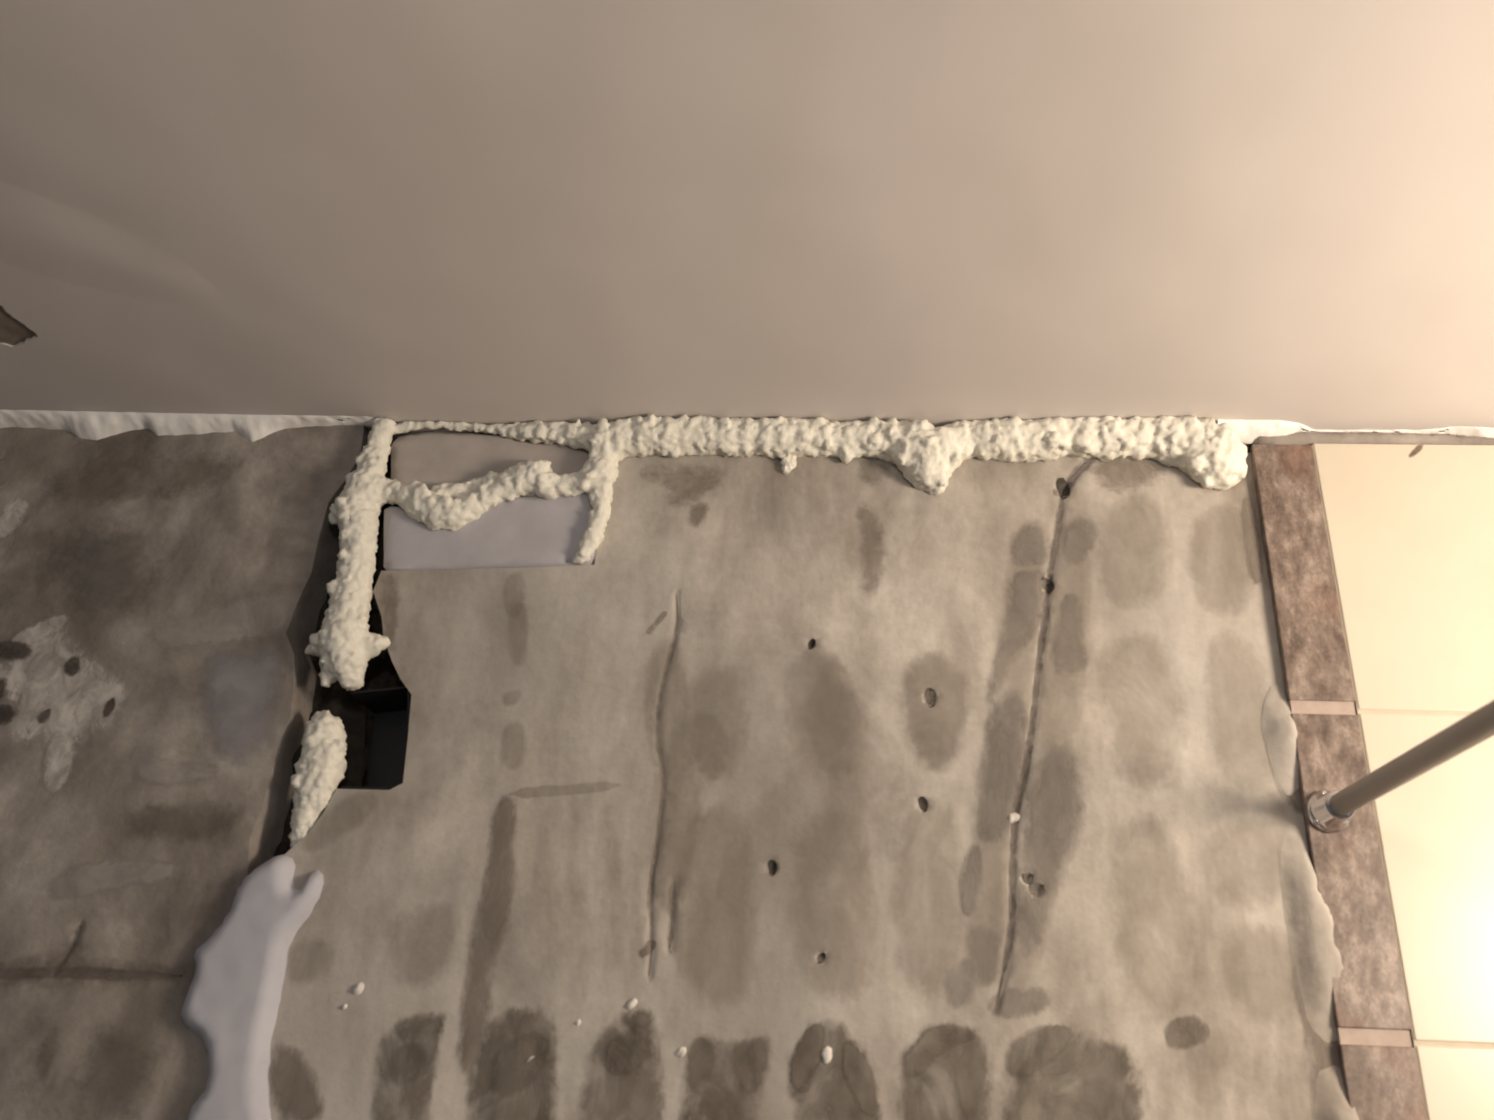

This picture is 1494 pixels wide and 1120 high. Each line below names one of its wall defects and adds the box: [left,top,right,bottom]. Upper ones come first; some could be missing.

spalling [0,306,37,345]
damp [1243,499,1261,583]
crack [951,463,1094,1017]
crack [640,603,679,975]
damp [1288,788,1303,811]
damp [460,798,515,1069]
damp [1167,1016,1209,1047]
damp [1296,990,1340,1074]
damp [271,1049,321,1120]